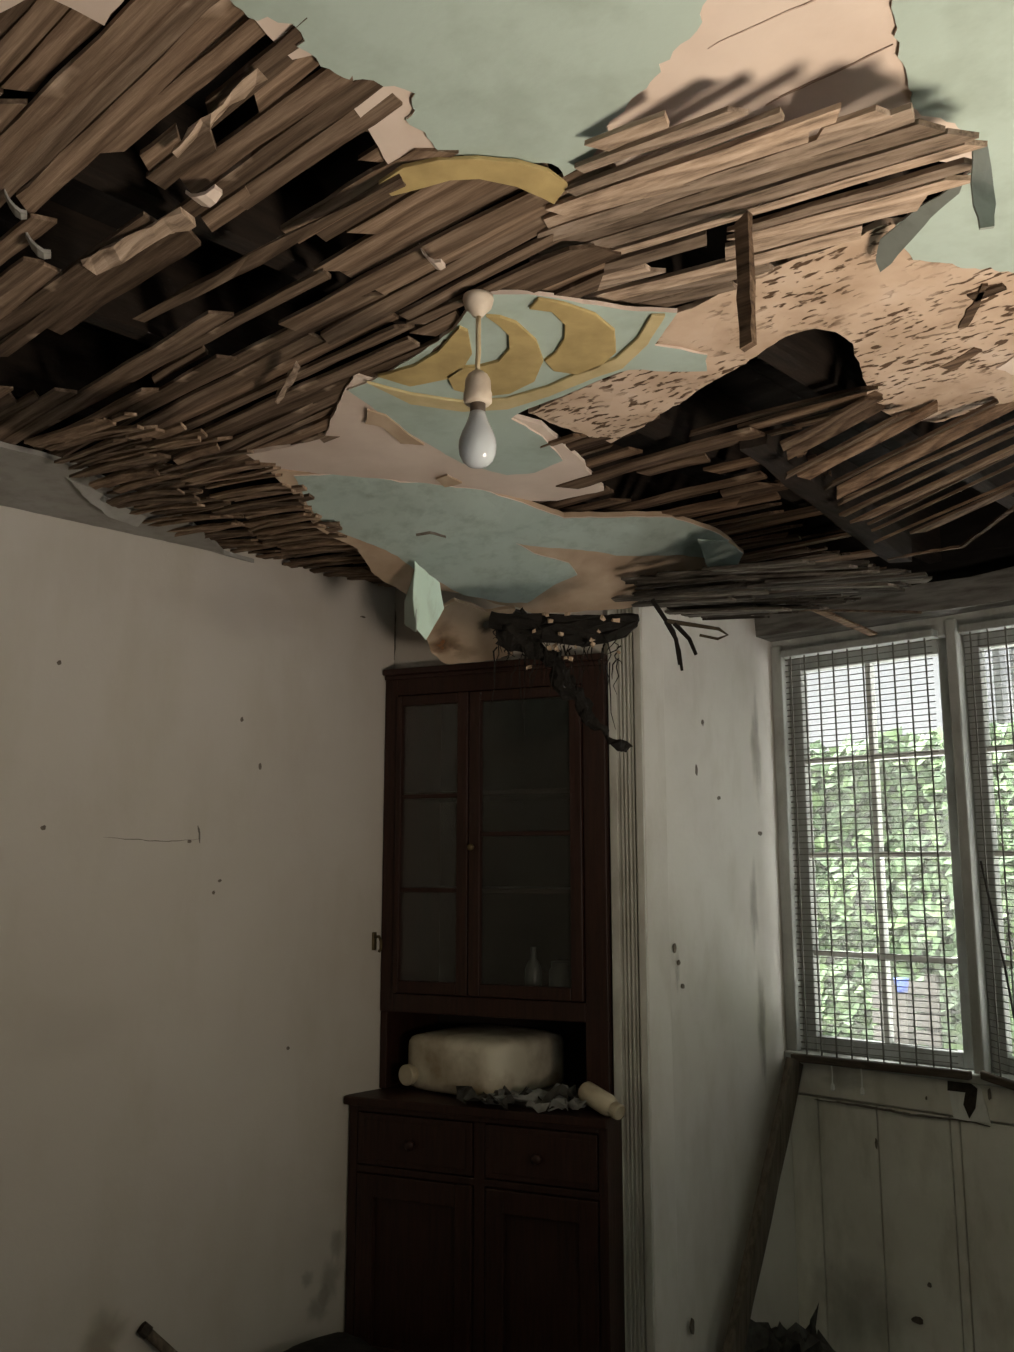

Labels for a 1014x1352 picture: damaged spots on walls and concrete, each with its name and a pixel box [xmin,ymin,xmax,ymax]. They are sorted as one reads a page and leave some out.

flaking render [0,0,24,13]
flaking render [55,0,124,25]
flaking render [255,17,294,43]
flaking render [288,48,312,60]
flaking render [593,0,961,165]
flaking render [355,86,435,164]
flaking render [24,139,1014,640]